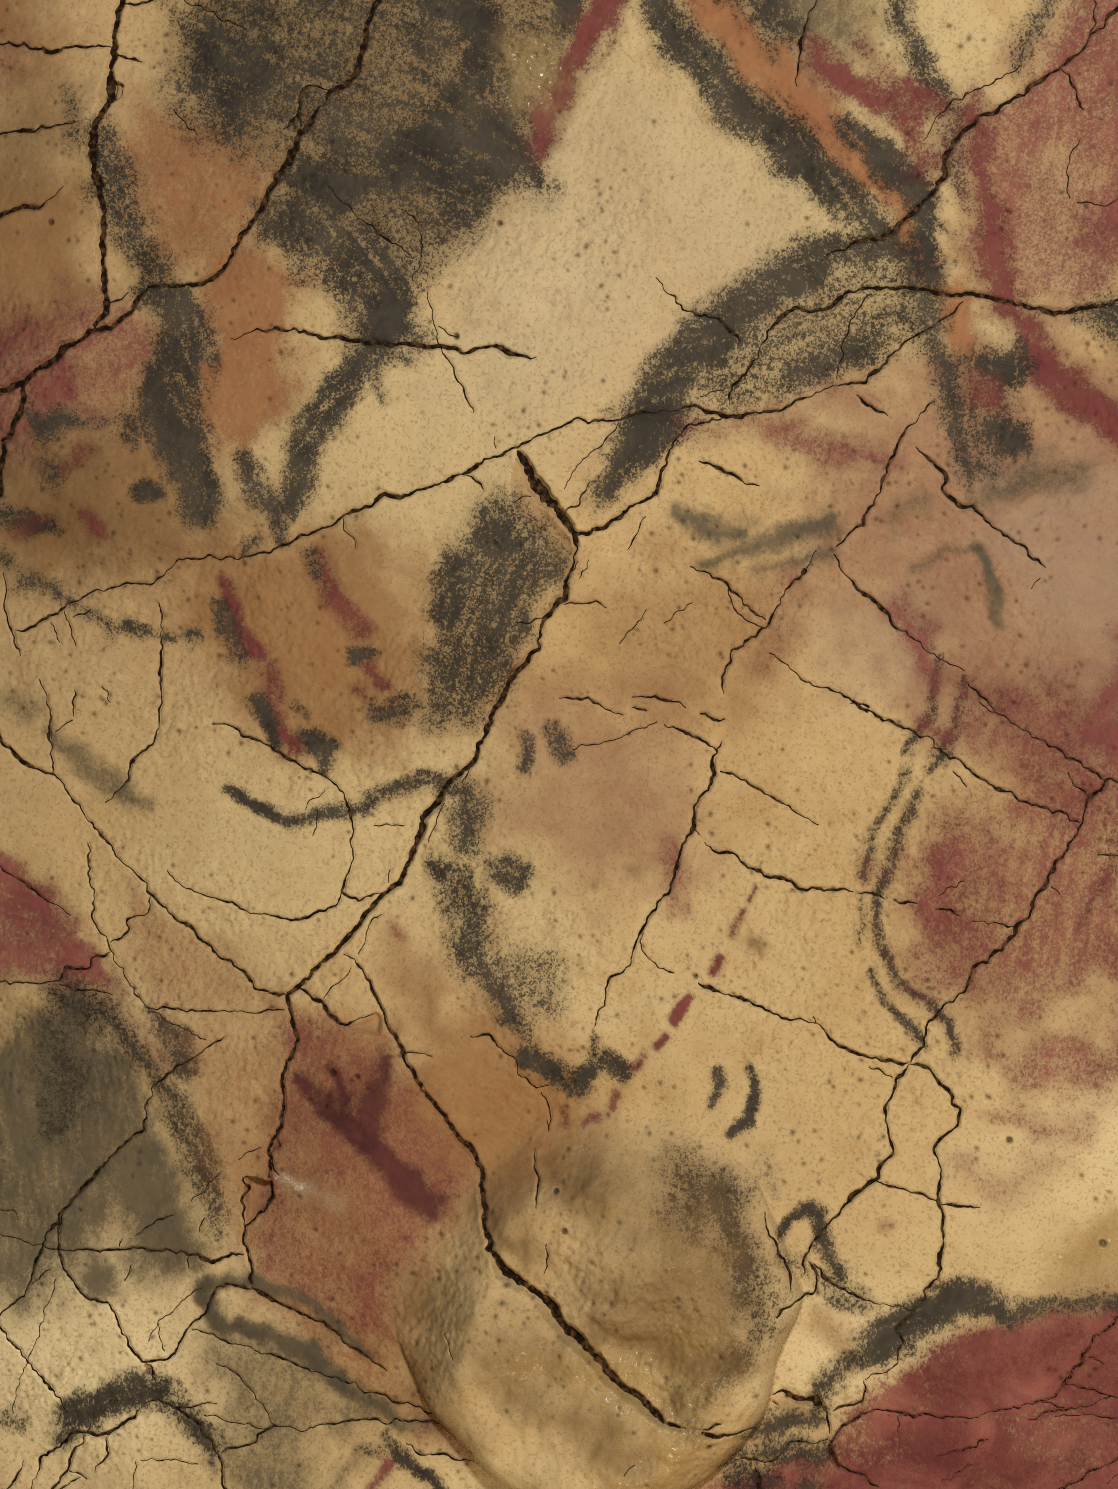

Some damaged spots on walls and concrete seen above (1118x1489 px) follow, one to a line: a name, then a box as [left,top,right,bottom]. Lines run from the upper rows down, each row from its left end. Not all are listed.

crack [795,0,817,86]
crack [821,0,1118,261]
crack [0,0,380,497]
crack [230,186,535,411]
crack [0,277,1118,1429]
crack [7,1460,24,1489]
crack [31,1409,140,1489]
crack [133,1458,198,1489]
crack [406,1443,475,1462]
crack [701,1423,755,1439]
crack [1059,1457,1118,1489]